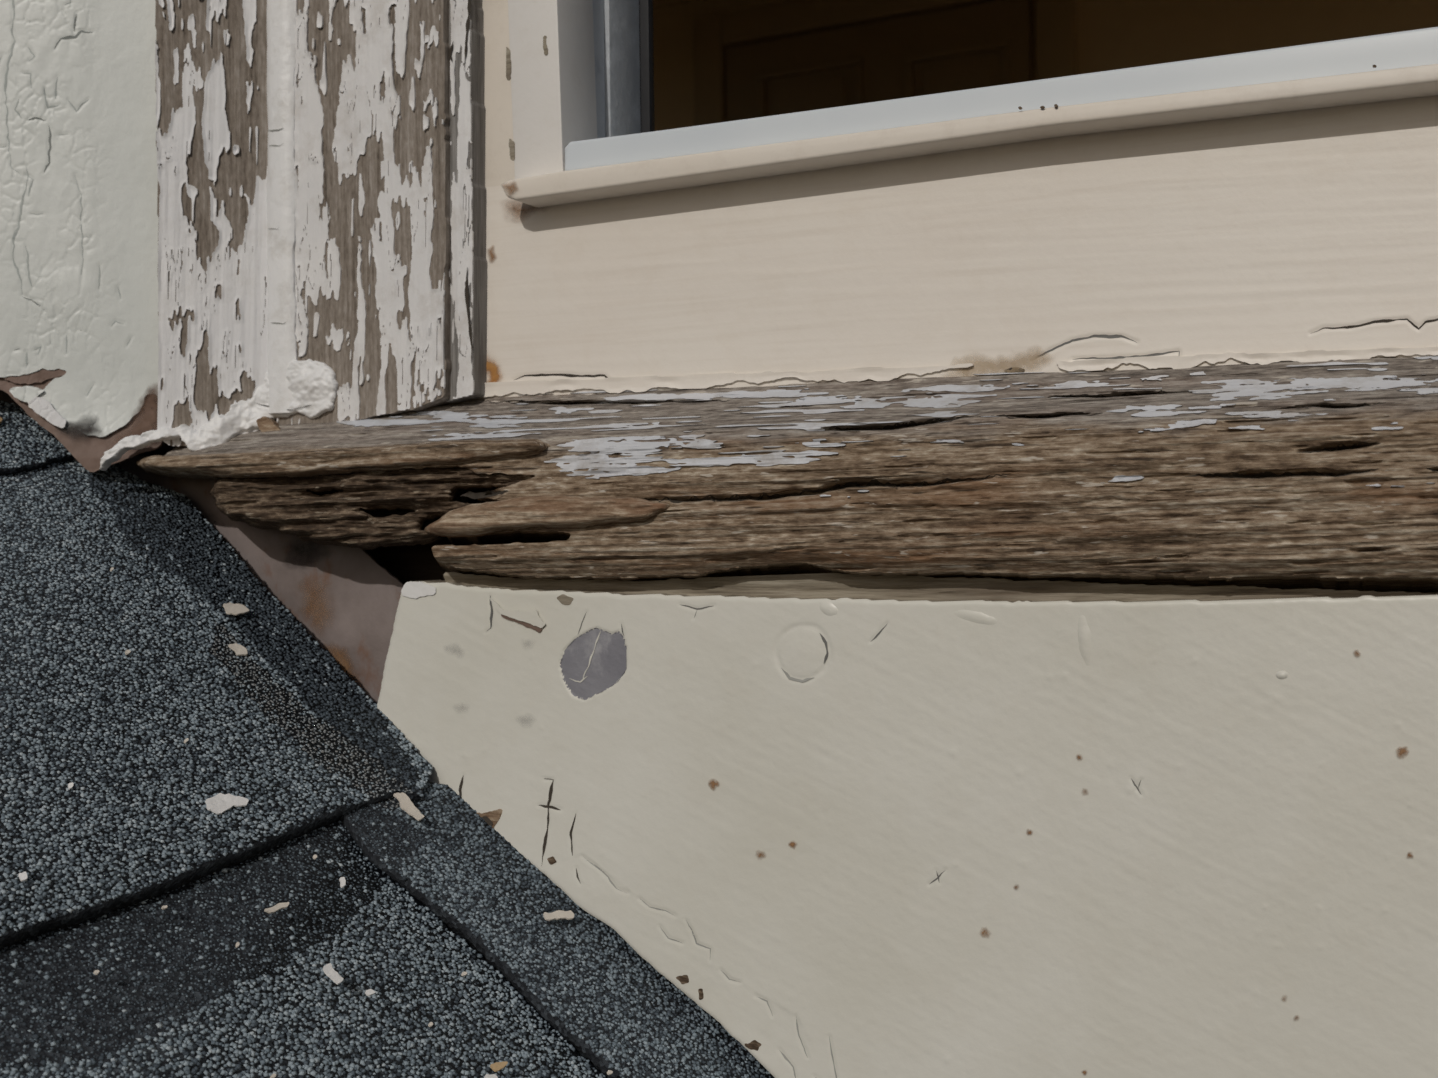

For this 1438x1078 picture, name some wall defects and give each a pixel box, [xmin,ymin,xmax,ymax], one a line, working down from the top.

crack [0,0,131,345]
peeling [155,0,268,446]
peeling [294,0,1438,479]
crack [1313,319,1438,333]
crack [15,335,67,368]
crack [1039,335,1180,360]
peeling [4,369,66,428]
peeling [1103,475,1144,483]
peeling [223,602,249,615]
spalling [401,581,436,599]
peeling [557,594,573,605]
peeling [560,628,627,700]